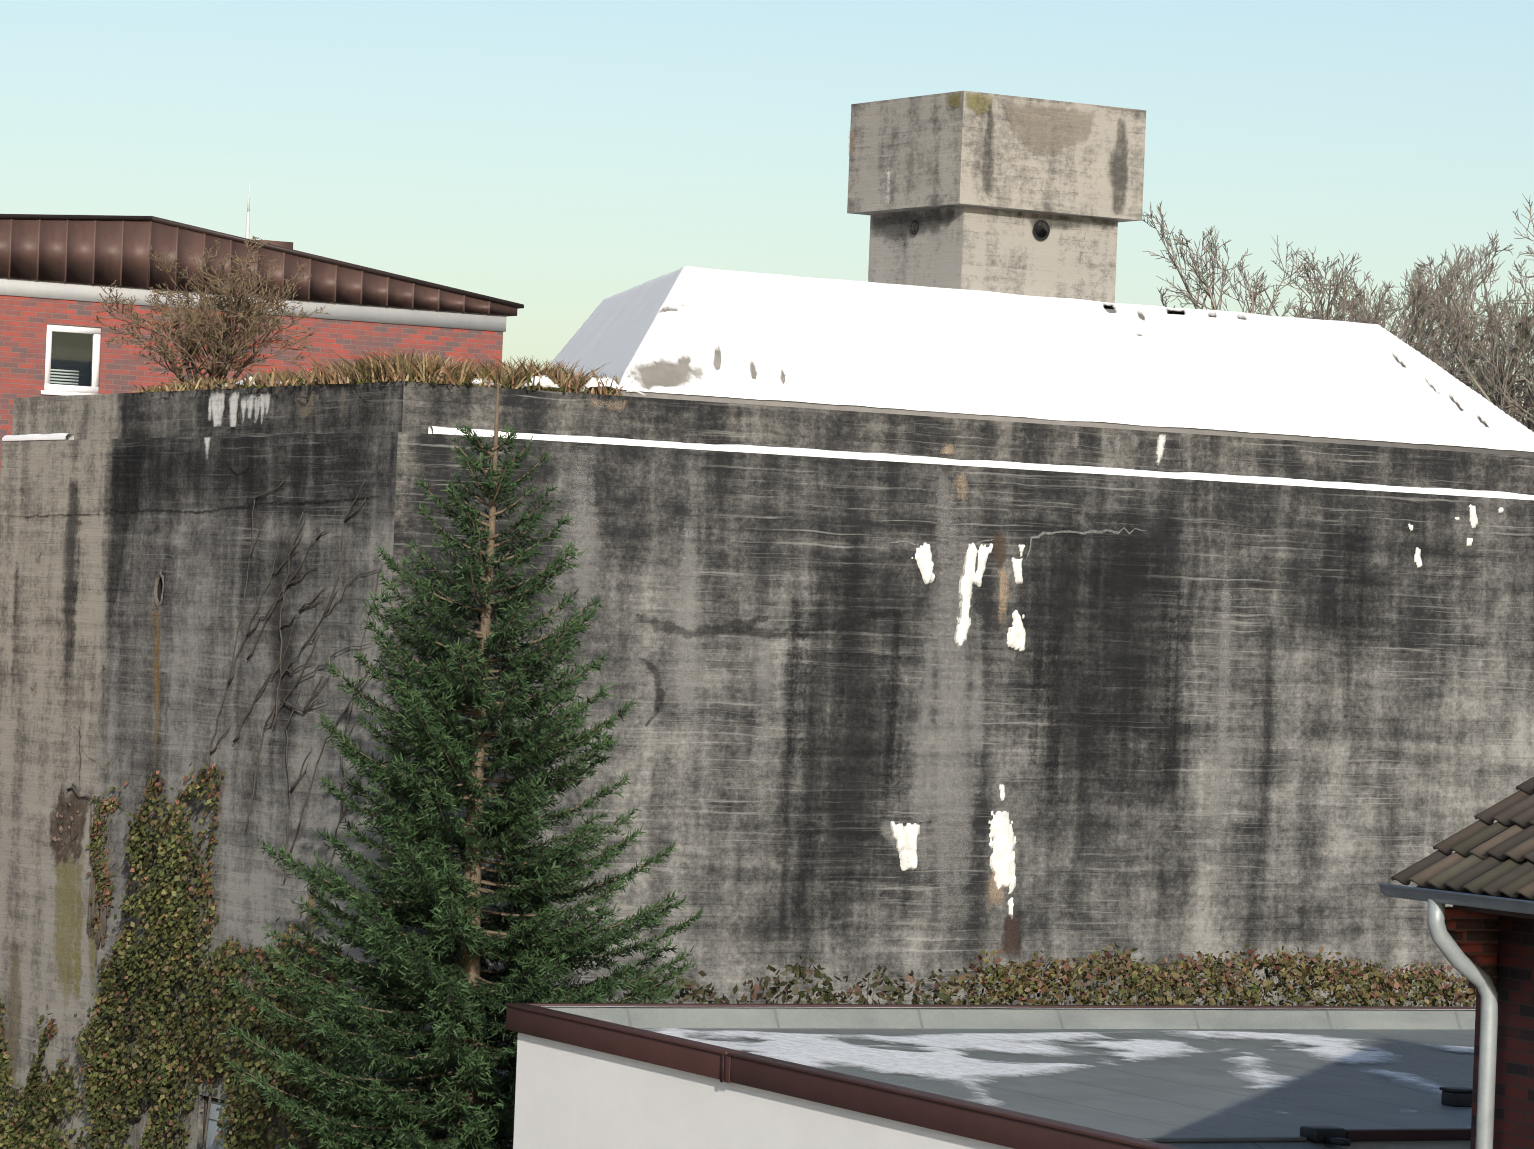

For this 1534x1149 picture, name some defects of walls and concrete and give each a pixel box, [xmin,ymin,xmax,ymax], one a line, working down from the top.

leakage [64,484,79,675]
leakage [105,448,142,616]
leakage [204,393,273,454]
leakage [566,454,597,601]
leakage [673,529,703,709]
leakage [786,548,900,917]
leakage [914,484,993,884]
crack [977,528,1145,557]
leakage [1025,532,1182,804]
leakage [1157,435,1165,463]
leakage [1260,627,1274,848]
leakage [1003,915,1021,953]